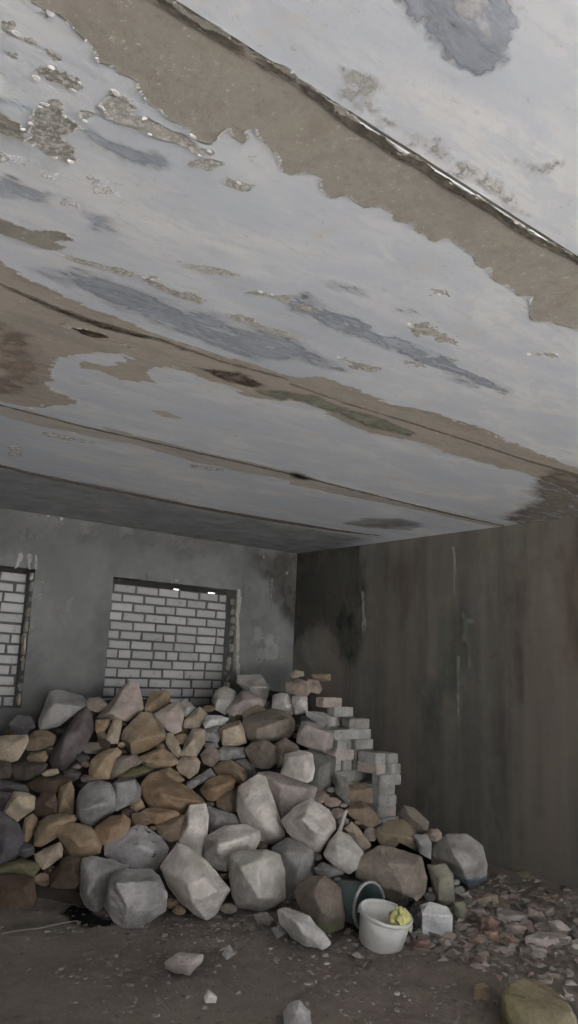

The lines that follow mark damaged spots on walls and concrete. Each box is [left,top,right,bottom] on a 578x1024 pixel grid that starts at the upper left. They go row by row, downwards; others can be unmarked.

leakage [405,0,517,75]
flaking render [0,0,578,329]
leakage [72,273,319,362]
leakage [289,294,507,392]
flaking render [0,261,578,527]
leakage [506,473,578,524]
leakage [254,545,366,659]